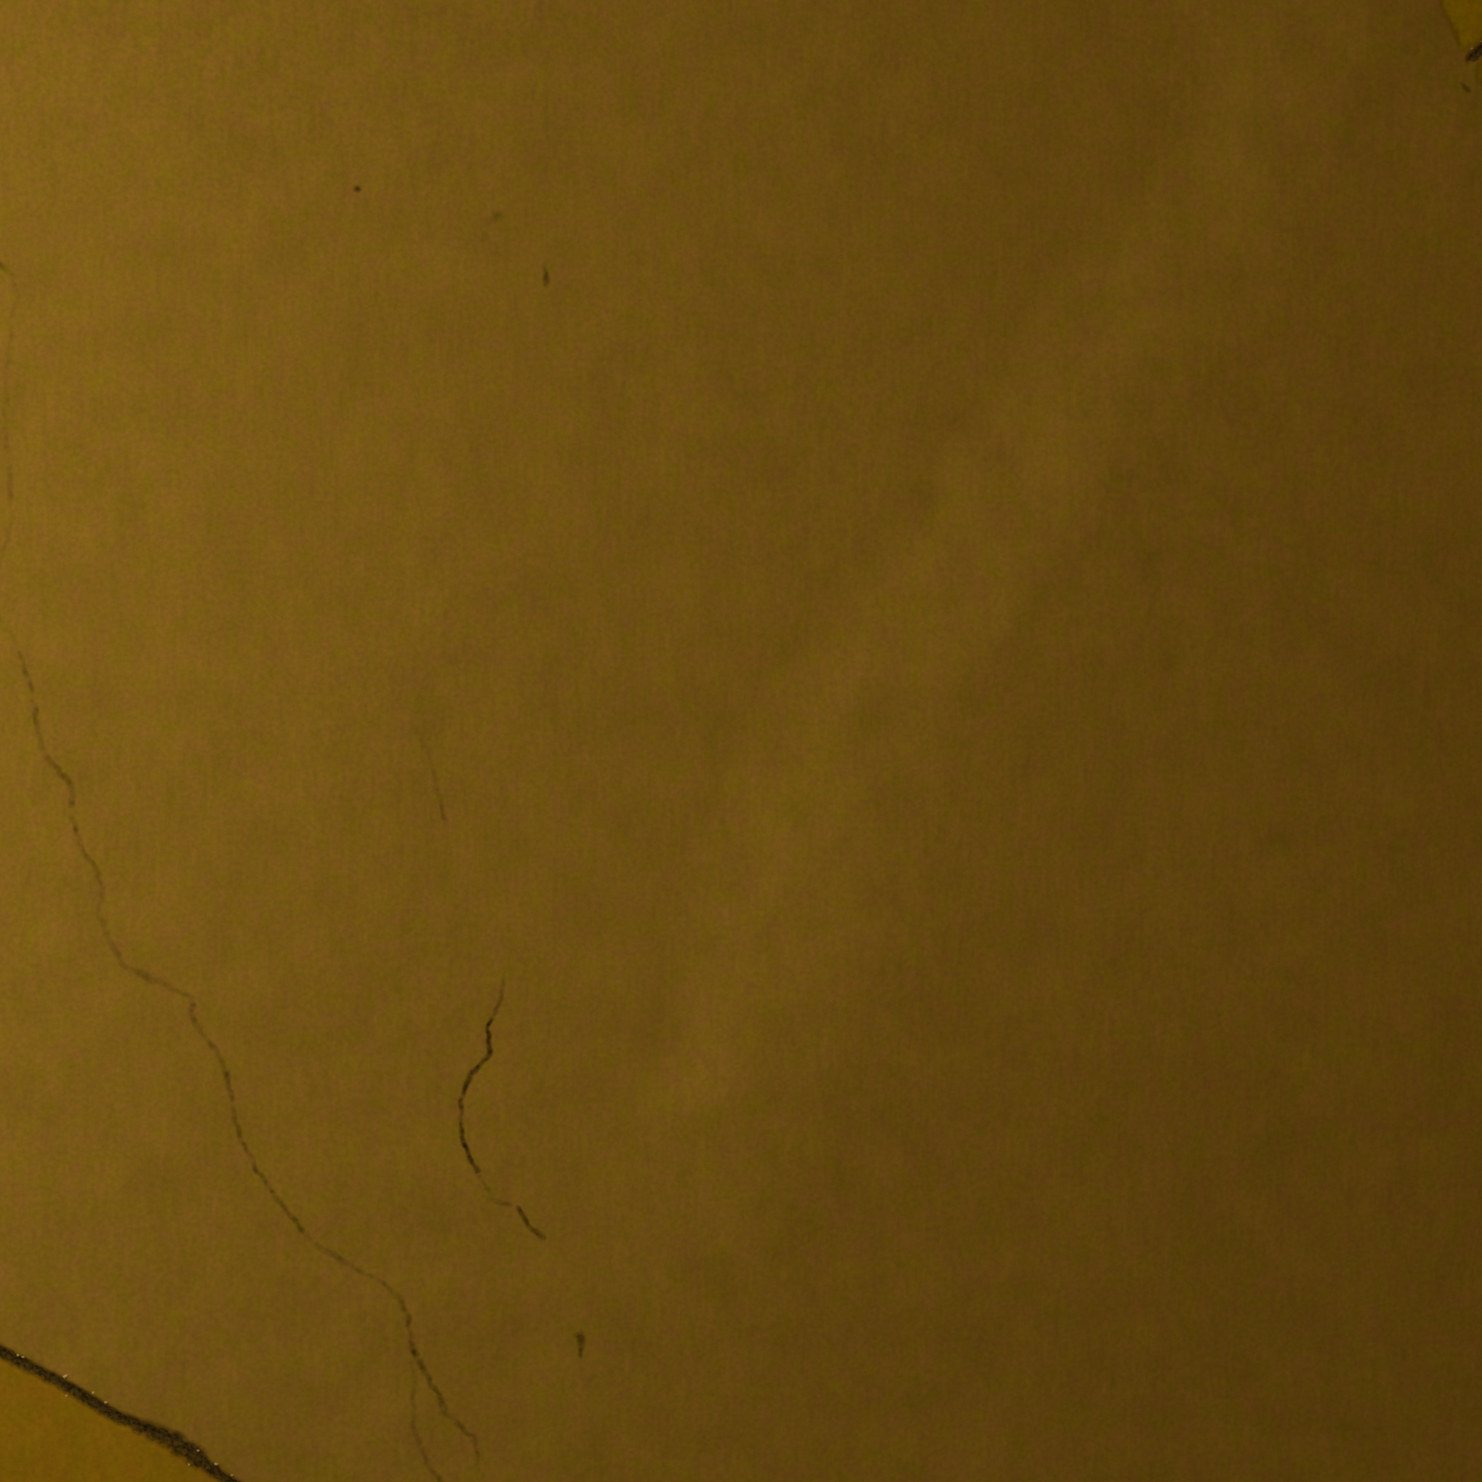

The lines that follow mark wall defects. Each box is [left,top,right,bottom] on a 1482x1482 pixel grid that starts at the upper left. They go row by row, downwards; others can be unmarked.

crack [459,1021,492,1163]
crack [0,1346,237,1482]